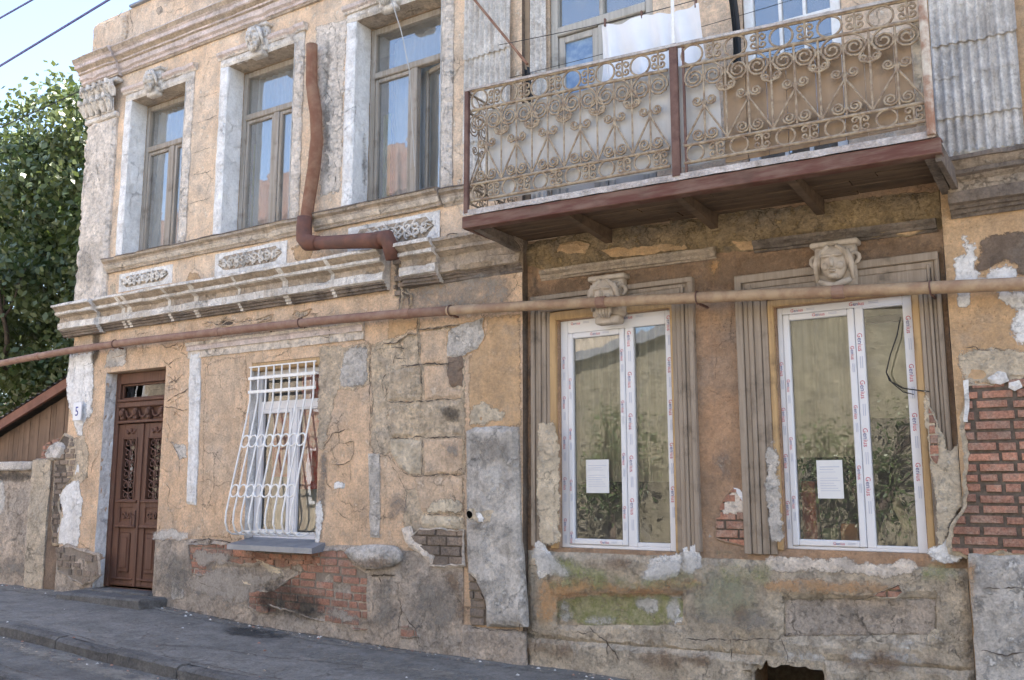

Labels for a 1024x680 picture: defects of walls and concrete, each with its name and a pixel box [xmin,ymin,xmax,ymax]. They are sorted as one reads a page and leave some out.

peeling [526,191,943,270]
peeling [953,231,1024,280]
flaking render [41,348,126,587]
crack [113,315,270,517]
peeling [171,356,371,631]
leakage [259,584,318,619]
crack [322,264,461,531]
peeling [339,317,505,625]
peeling [534,422,561,579]
leakage [636,598,678,619]
leakage [644,552,697,581]
flaking render [923,291,1024,564]